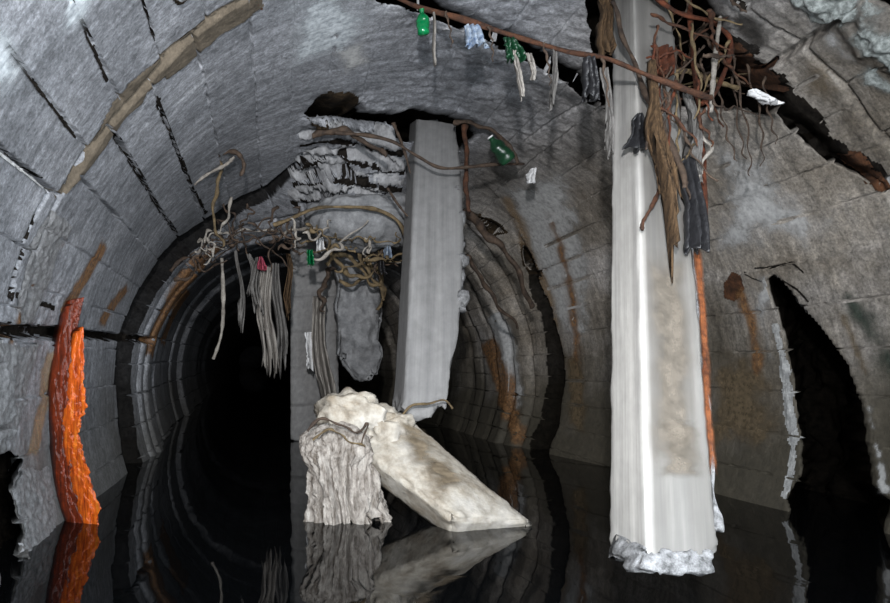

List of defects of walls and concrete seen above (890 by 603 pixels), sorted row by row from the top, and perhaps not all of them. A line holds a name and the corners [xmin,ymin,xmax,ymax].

water stain [0,32,17,81]
water stain [66,0,91,28]
crack [734,0,747,10]
water stain [790,0,880,26]
water stain [854,29,890,92]
crack [673,29,890,192]
corrosion [558,242,586,428]
corrosion [723,272,763,373]
crack [744,261,809,302]
corrosion [29,243,106,525]
corrosion [482,337,526,443]
spalling [8,457,57,552]